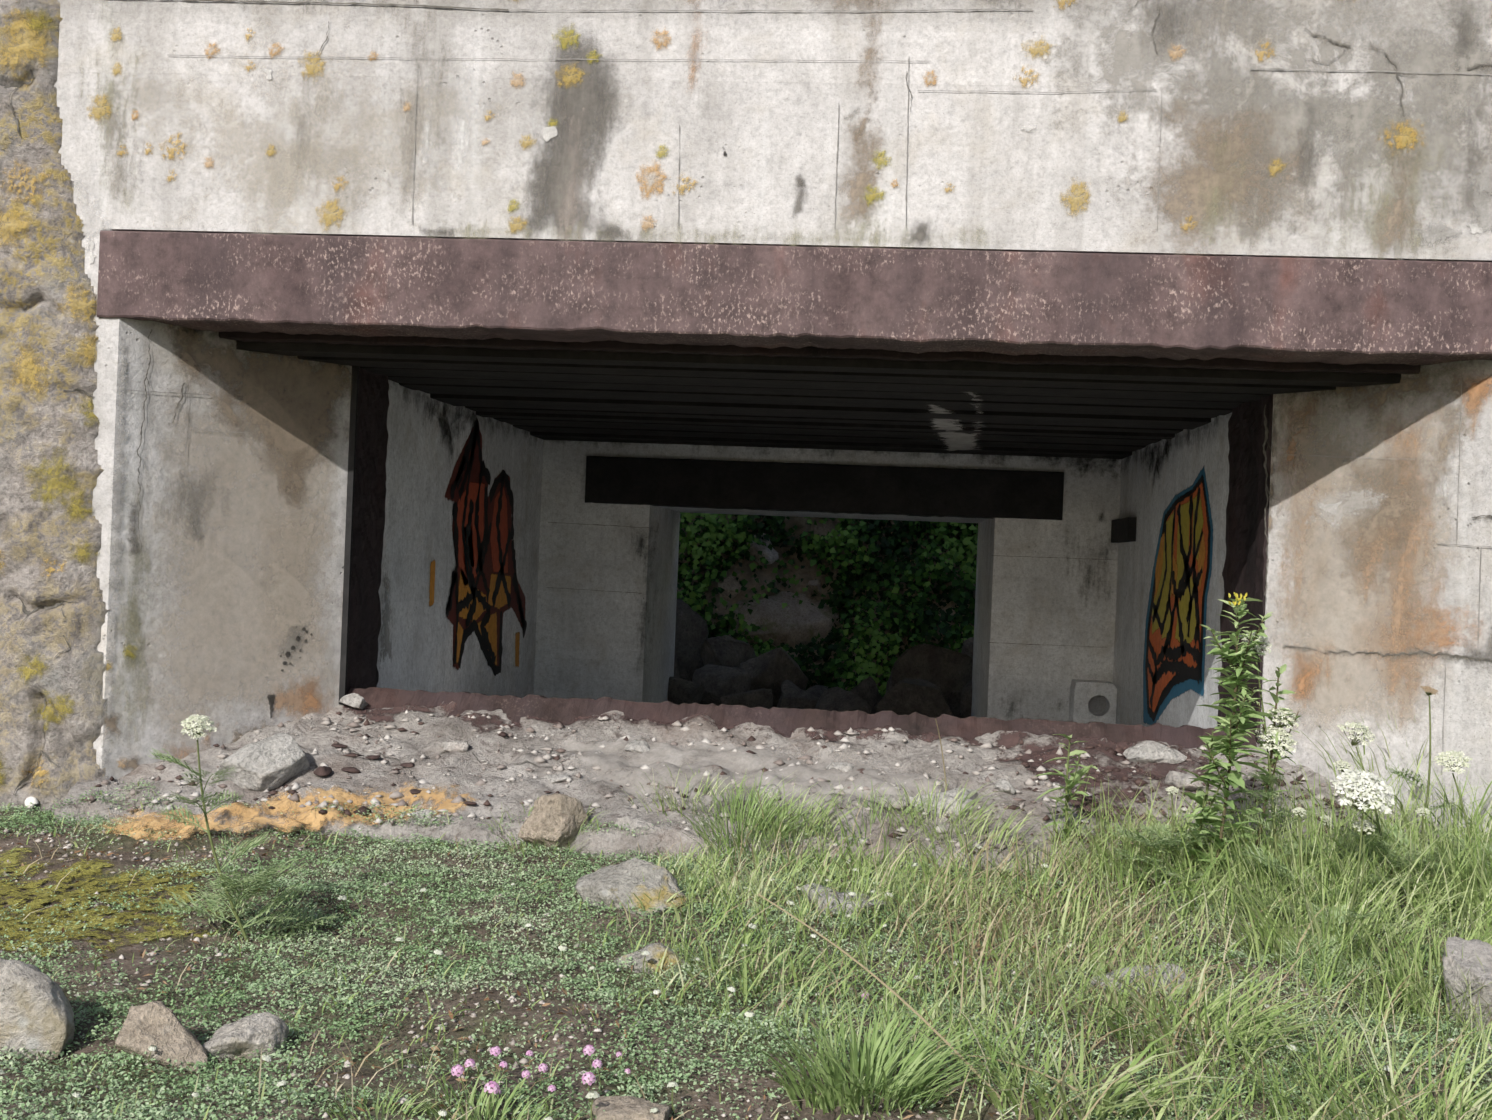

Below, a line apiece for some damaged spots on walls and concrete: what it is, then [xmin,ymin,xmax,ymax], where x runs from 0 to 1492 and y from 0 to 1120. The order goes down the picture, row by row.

water stain [527,43,621,239]
water stain [848,115,879,244]
water stain [913,225,927,241]
water stain [1099,0,1492,249]
crack [137,329,190,553]
spalling [929,392,982,451]
corrosion [1285,369,1492,719]